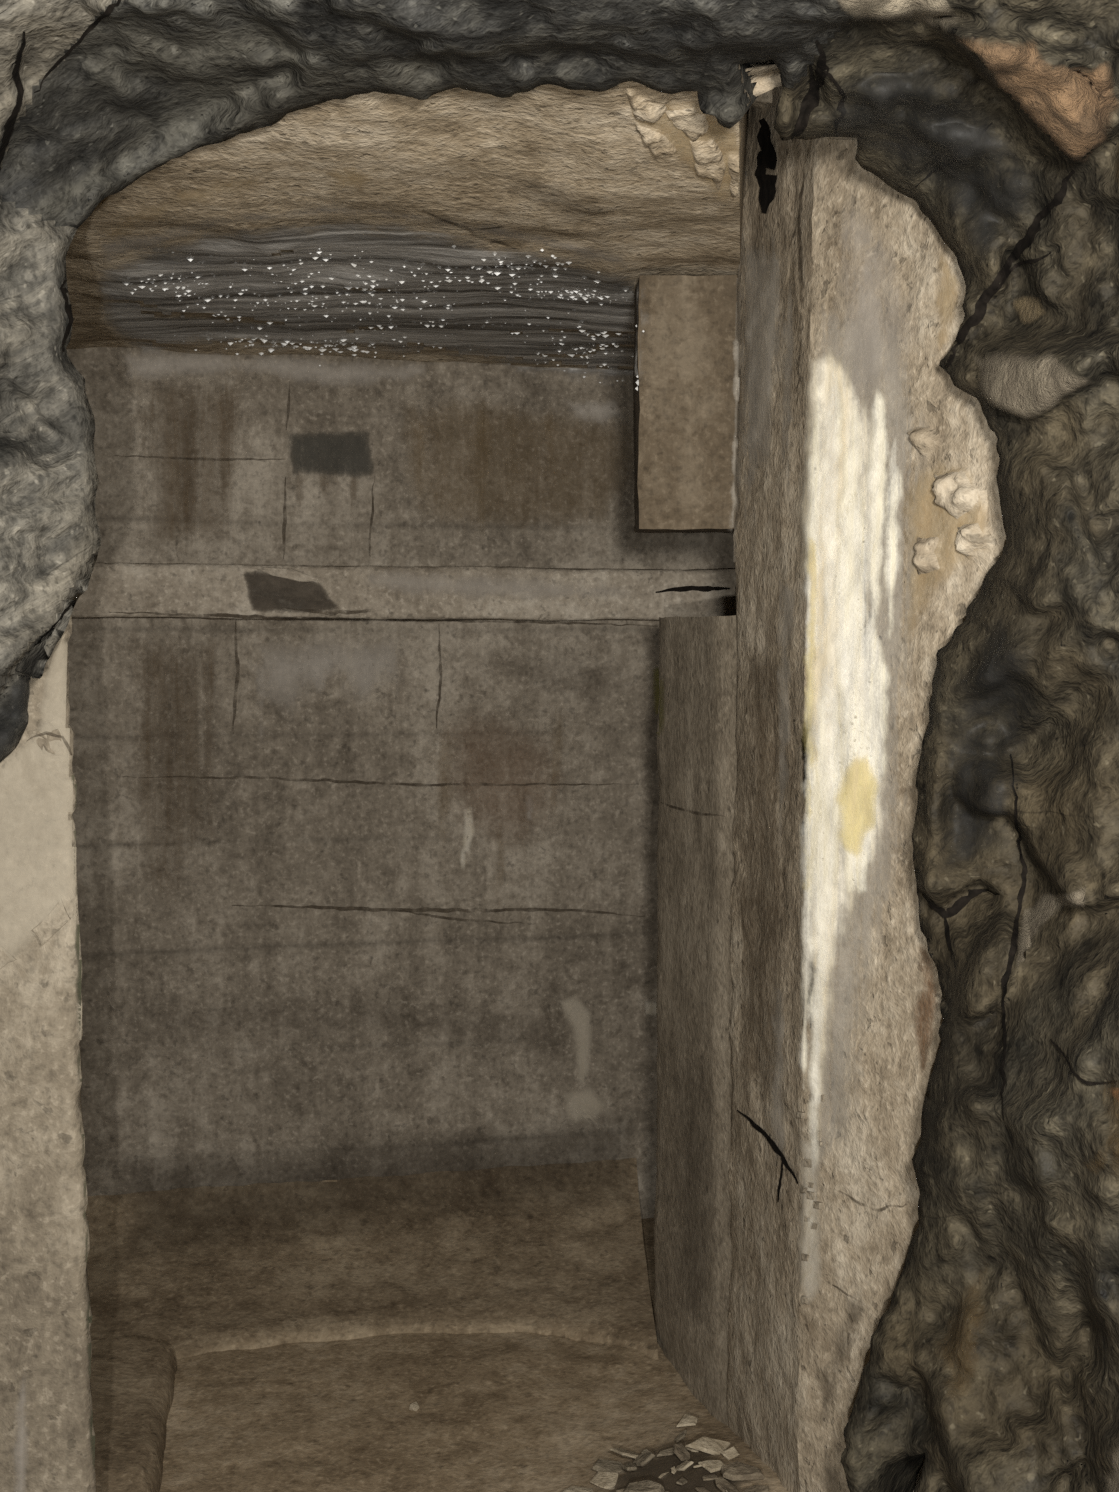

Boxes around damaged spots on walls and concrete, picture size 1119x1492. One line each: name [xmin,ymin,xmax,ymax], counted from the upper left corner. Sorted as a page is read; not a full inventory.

leakage [101,209,644,391]
leakage [780,292,994,1151]
crack [737,1110,799,1202]